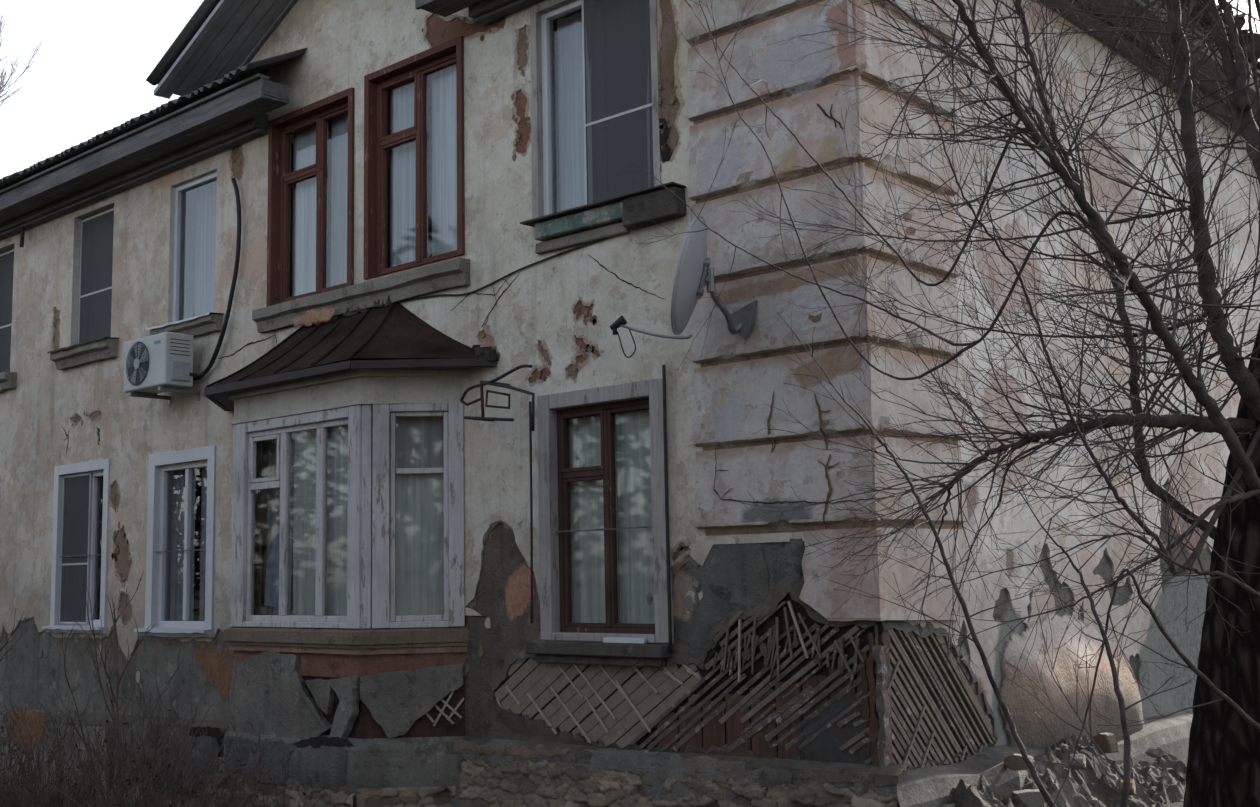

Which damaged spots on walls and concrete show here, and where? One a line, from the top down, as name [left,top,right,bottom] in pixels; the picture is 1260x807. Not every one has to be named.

flaking render [421,13,531,161]
flaking render [656,0,684,172]
flaking render [526,298,601,386]
flaking render [70,408,102,445]
crack [713,391,879,529]
flaking render [0,481,774,759]
flaking render [665,540,998,772]
flaking render [992,588,1009,623]
flaking render [1039,545,1082,621]
flaking render [1093,550,1131,606]